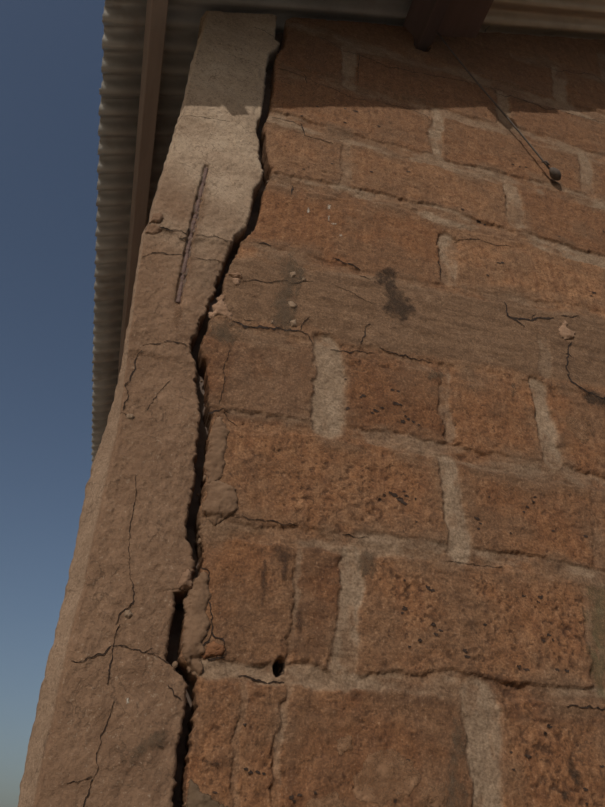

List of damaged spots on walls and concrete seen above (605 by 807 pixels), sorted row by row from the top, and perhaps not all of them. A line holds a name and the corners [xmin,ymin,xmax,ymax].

crack [121,27,605,582]
water stain [374,268,415,320]
crack [70,476,226,807]
crack [239,675,284,684]